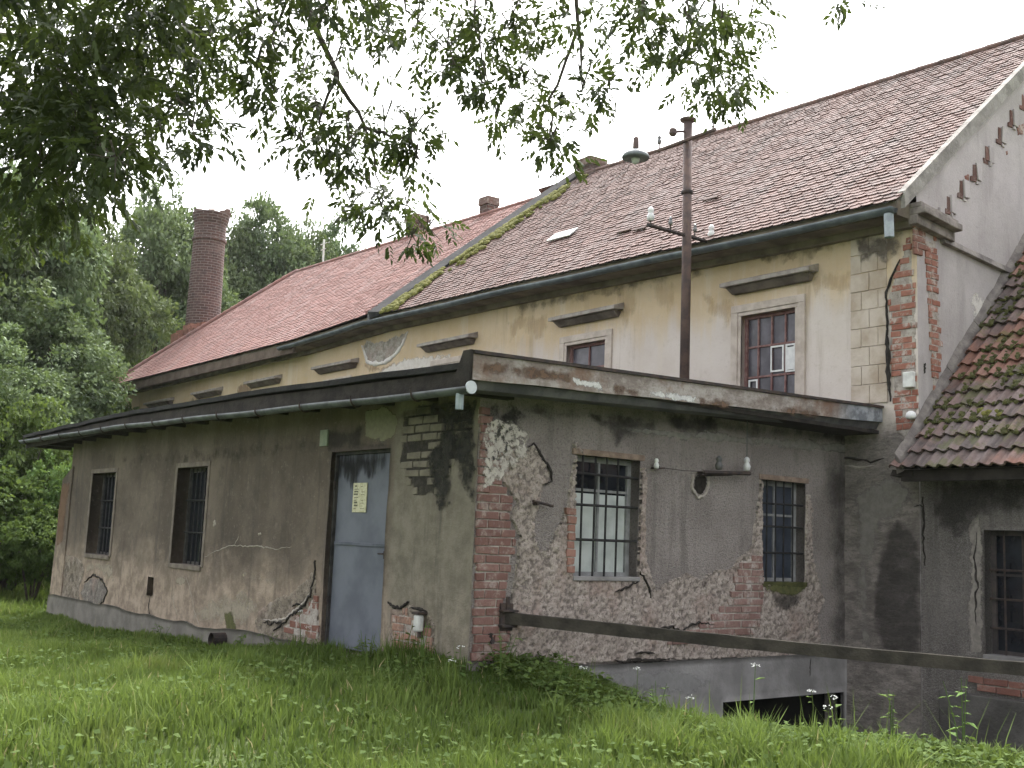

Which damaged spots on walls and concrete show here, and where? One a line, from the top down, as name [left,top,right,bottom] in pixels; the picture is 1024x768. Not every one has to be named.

crack [885,259,900,402]
flaking render [888,226,943,438]
flaking render [61,554,108,604]
crack [263,560,316,631]
flaking render [388,604,437,654]
flaking render [400,401,825,665]
damp [875,522,920,652]
crack [914,497,926,566]
crack [972,532,980,625]
flaking render [968,675,1024,698]